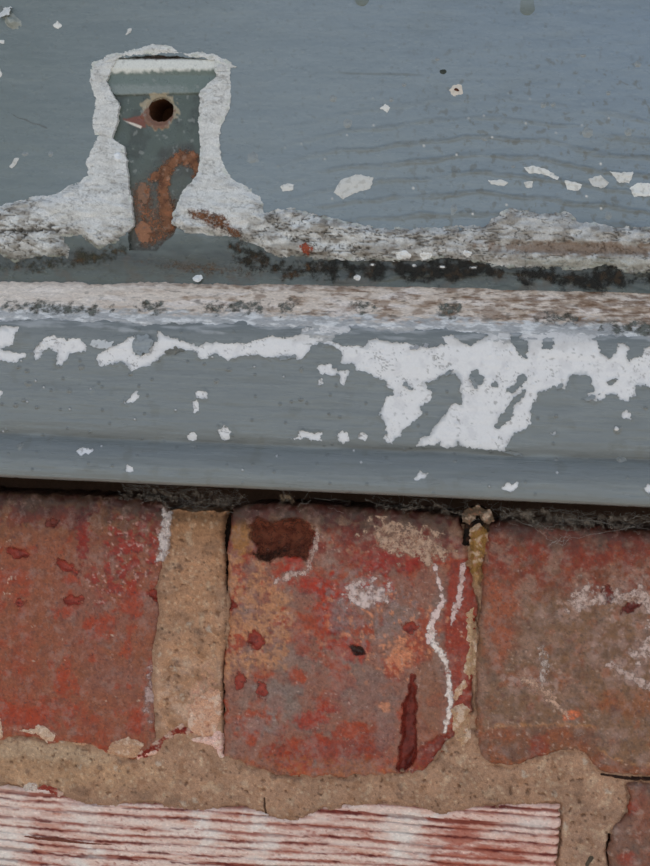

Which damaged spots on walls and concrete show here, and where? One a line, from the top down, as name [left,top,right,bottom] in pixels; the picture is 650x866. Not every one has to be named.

rust [133,149,200,248]
peeling [334,174,373,199]
peeling [524,166,650,197]
leakage [308,257,505,283]
leakage [516,265,650,293]
peeling [0,325,650,457]
crack [225,512,233,591]
leakage [355,516,466,733]
spalling [395,673,418,771]
crack [585,833,610,866]